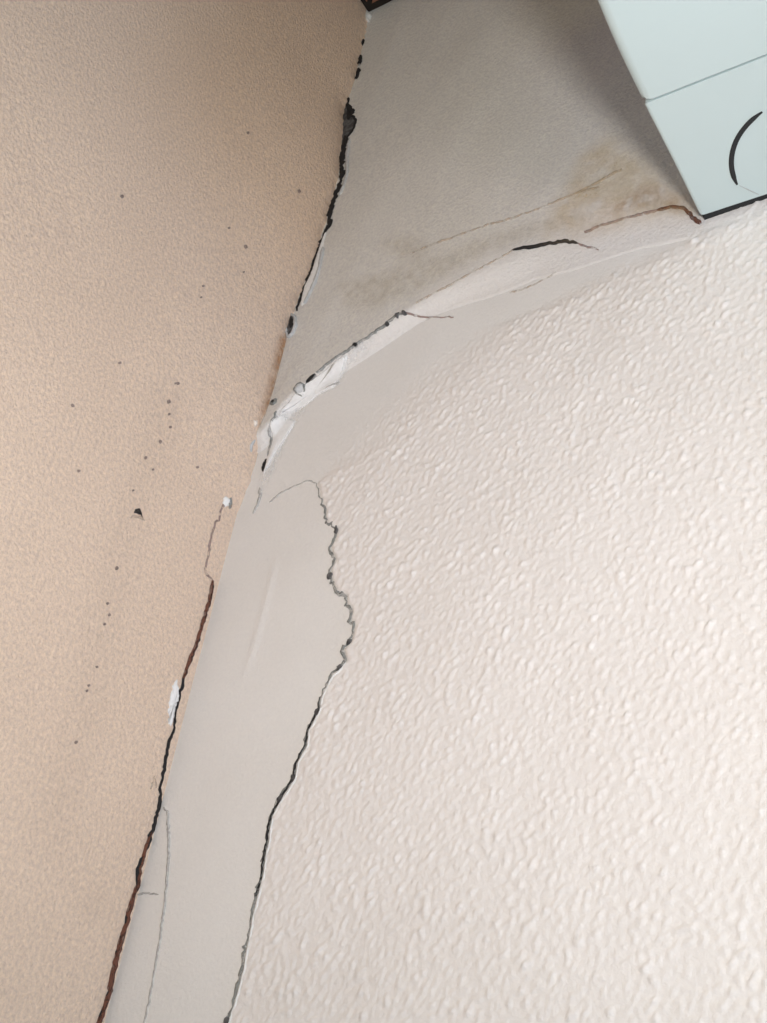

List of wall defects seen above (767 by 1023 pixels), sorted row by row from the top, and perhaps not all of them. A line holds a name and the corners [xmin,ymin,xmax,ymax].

crack [296,39,365,311]
crack [412,170,621,253]
peeling [285,232,326,339]
crack [293,205,701,396]
crack [267,411,277,456]
peeling [263,347,361,478]